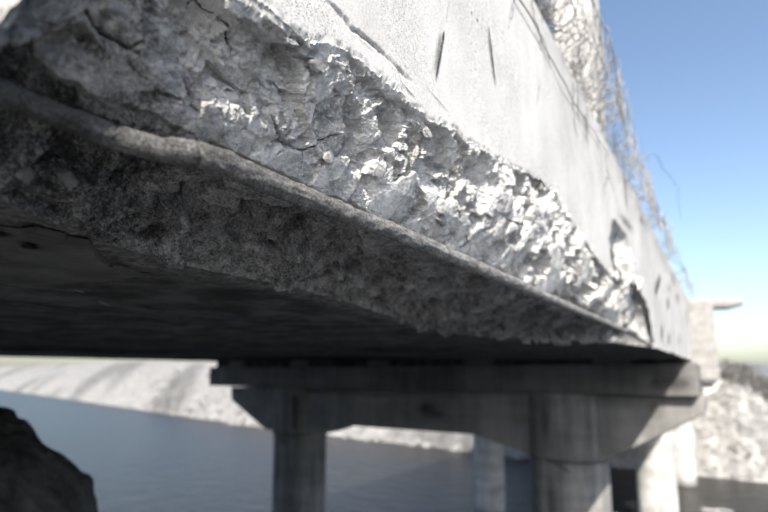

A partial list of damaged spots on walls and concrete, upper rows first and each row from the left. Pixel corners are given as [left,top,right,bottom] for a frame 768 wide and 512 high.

crack [185,0,232,54]
crack [331,5,447,110]
spalling [0,0,654,349]